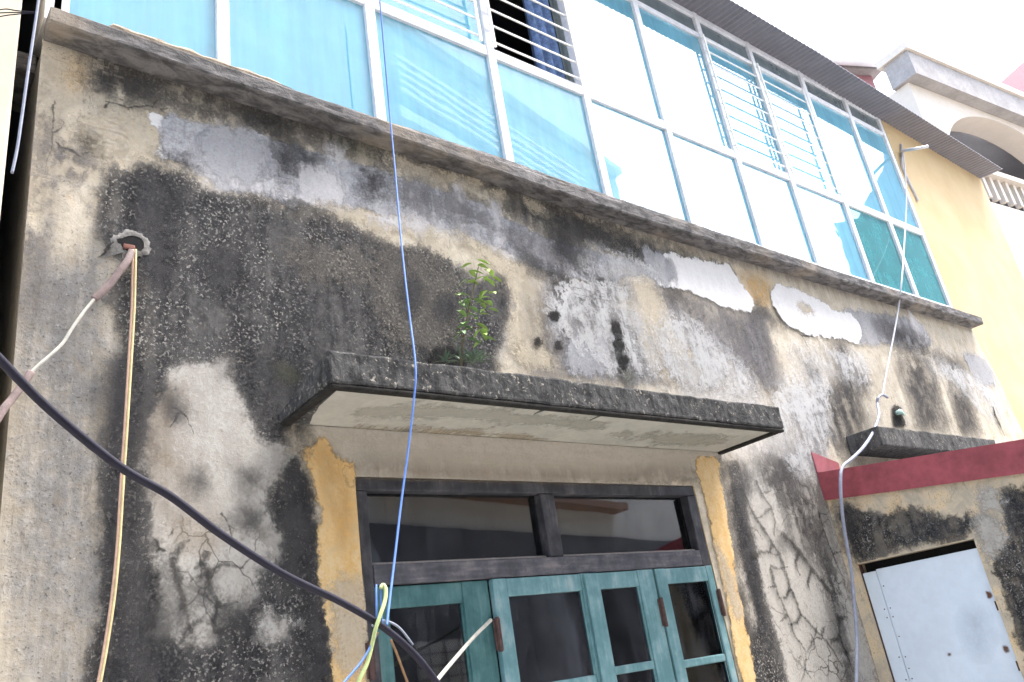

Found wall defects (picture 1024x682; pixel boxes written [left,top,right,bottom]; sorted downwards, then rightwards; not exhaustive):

damp [88,56,404,178]
peeling [78,108,756,396]
damp [467,183,724,265]
crack [154,528,237,641]
damp [82,161,510,682]
damp [719,342,868,682]
crack [745,480,853,675]
flaking render [741,283,932,682]
damp [836,503,977,563]
damp [876,320,996,436]